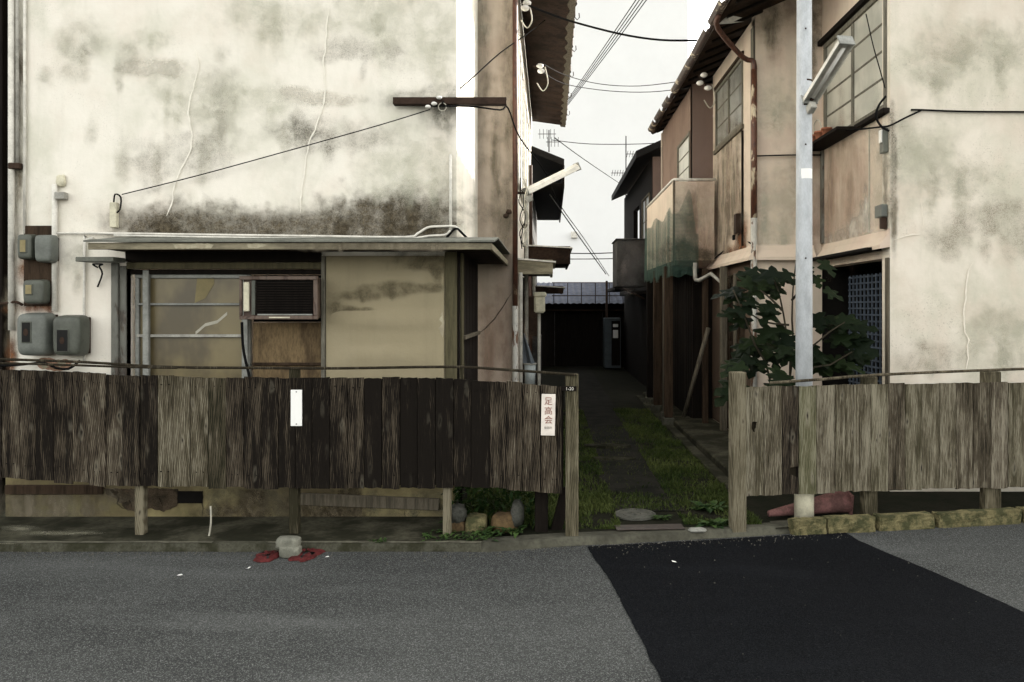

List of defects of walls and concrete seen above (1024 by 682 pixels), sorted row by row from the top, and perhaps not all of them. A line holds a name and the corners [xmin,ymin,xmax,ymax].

crack [167,51,199,214]
water stain [119,193,463,243]
crack [299,10,329,212]
water stain [664,140,741,264]
corrosion [727,216,746,253]
water stain [883,116,897,237]
crack [963,264,972,369]